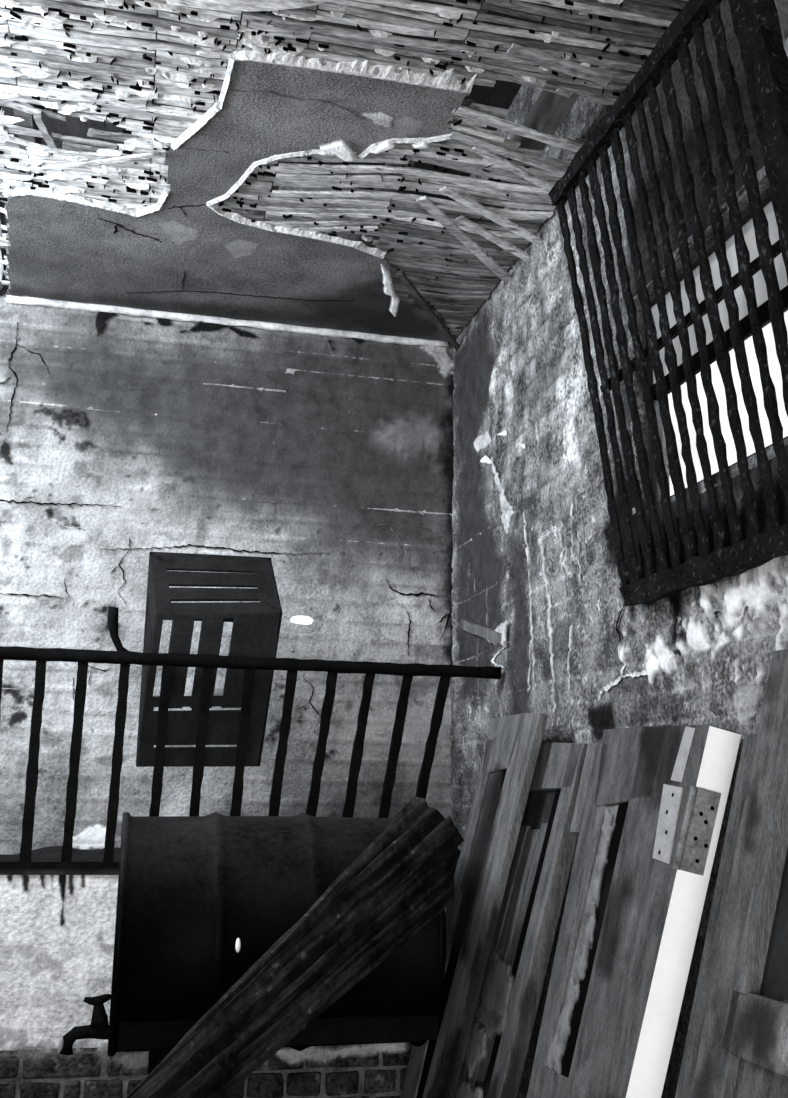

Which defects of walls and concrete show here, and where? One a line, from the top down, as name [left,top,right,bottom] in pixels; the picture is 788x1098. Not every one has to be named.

spalling [0,0,689,535]
crack [0,322,50,432]
crack [0,497,124,507]
crack [1,582,69,598]
crack [100,539,329,604]
leakage [646,558,788,683]